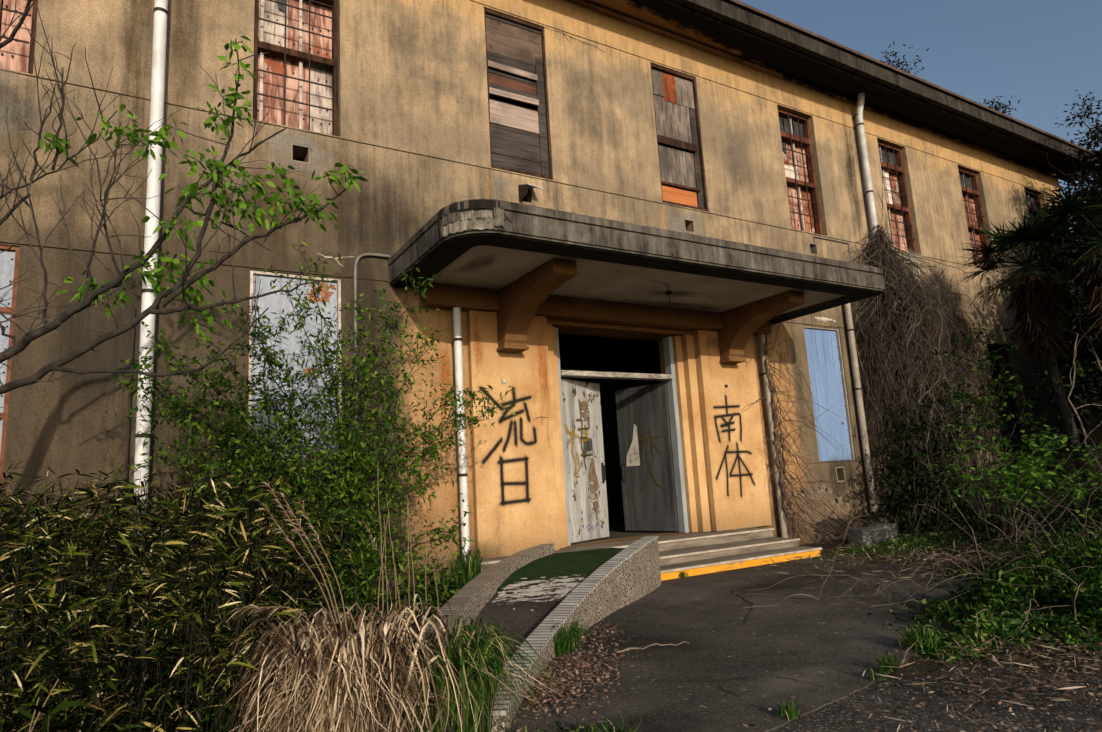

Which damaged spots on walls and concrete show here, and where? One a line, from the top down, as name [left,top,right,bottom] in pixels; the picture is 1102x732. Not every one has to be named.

spalling [437,199,504,240]
peeling [580,401,591,421]
peeling [586,450,602,517]